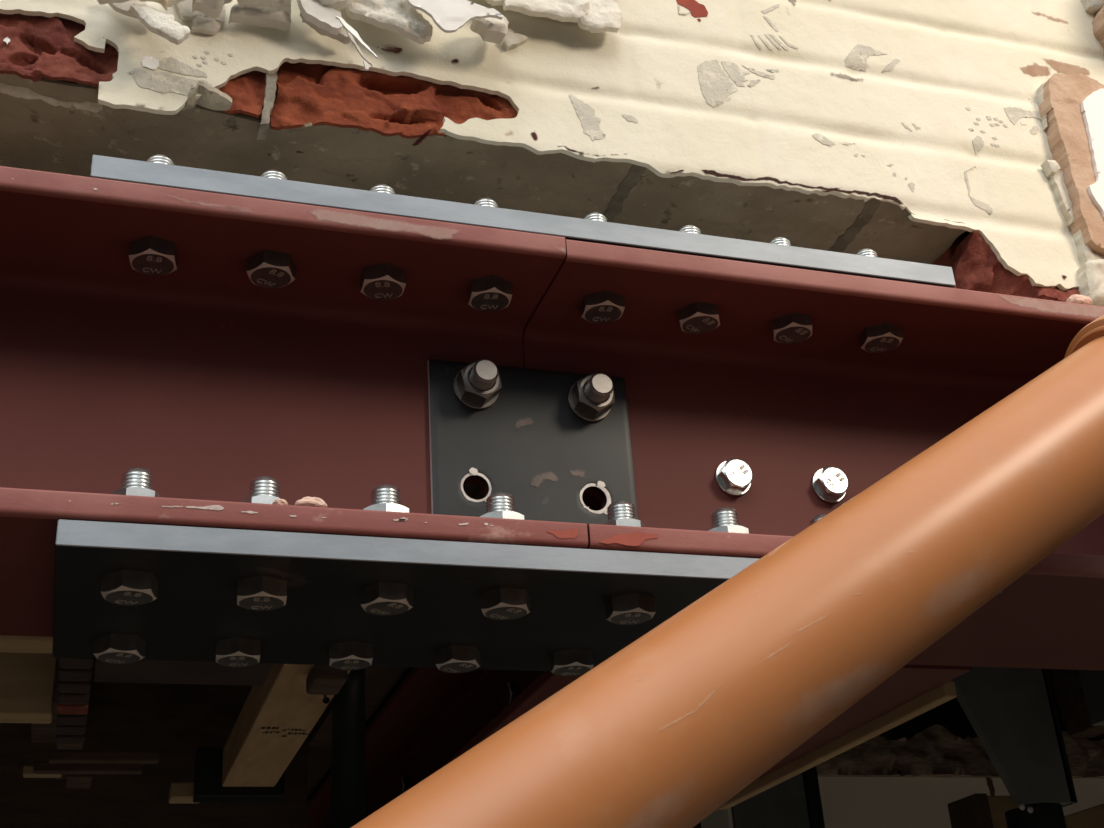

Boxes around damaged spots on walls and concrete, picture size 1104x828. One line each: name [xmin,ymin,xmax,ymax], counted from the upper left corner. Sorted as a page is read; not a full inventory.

spalling [0,13,118,88]
flaking render [97,0,623,141]
peeling [676,0,708,22]
peeling [697,60,779,108]
peeling [844,44,900,73]
flaking render [1081,0,1104,52]
flaking render [939,73,1104,307]